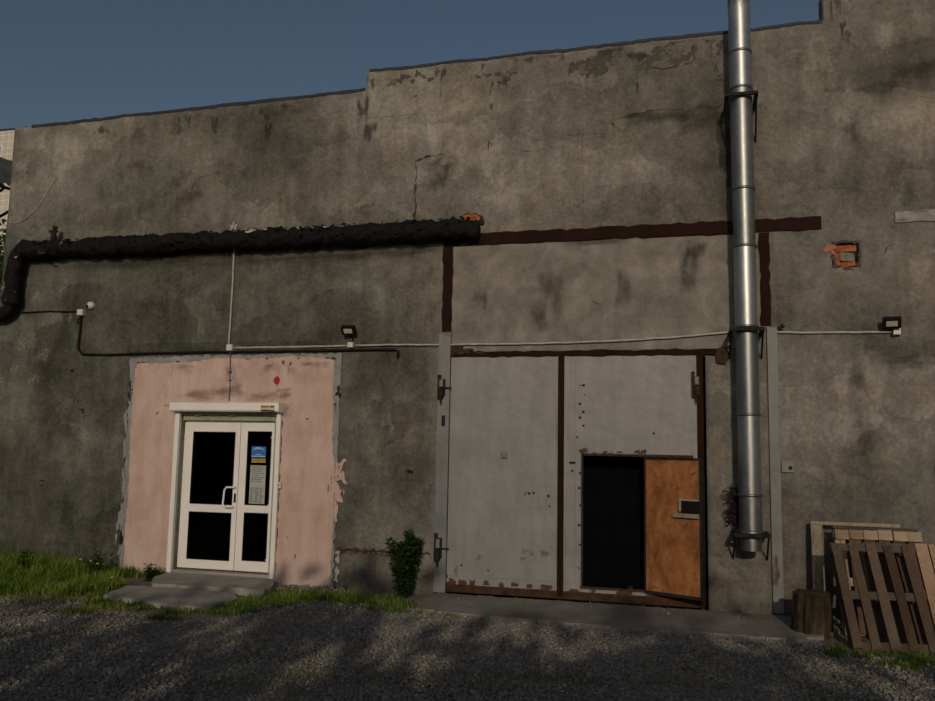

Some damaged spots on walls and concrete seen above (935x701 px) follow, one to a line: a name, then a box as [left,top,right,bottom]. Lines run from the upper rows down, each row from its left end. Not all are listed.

spalling [568,53,616,80]
crack [357,87,444,220]
peeling [328,459,348,523]
rust [446,575,553,590]